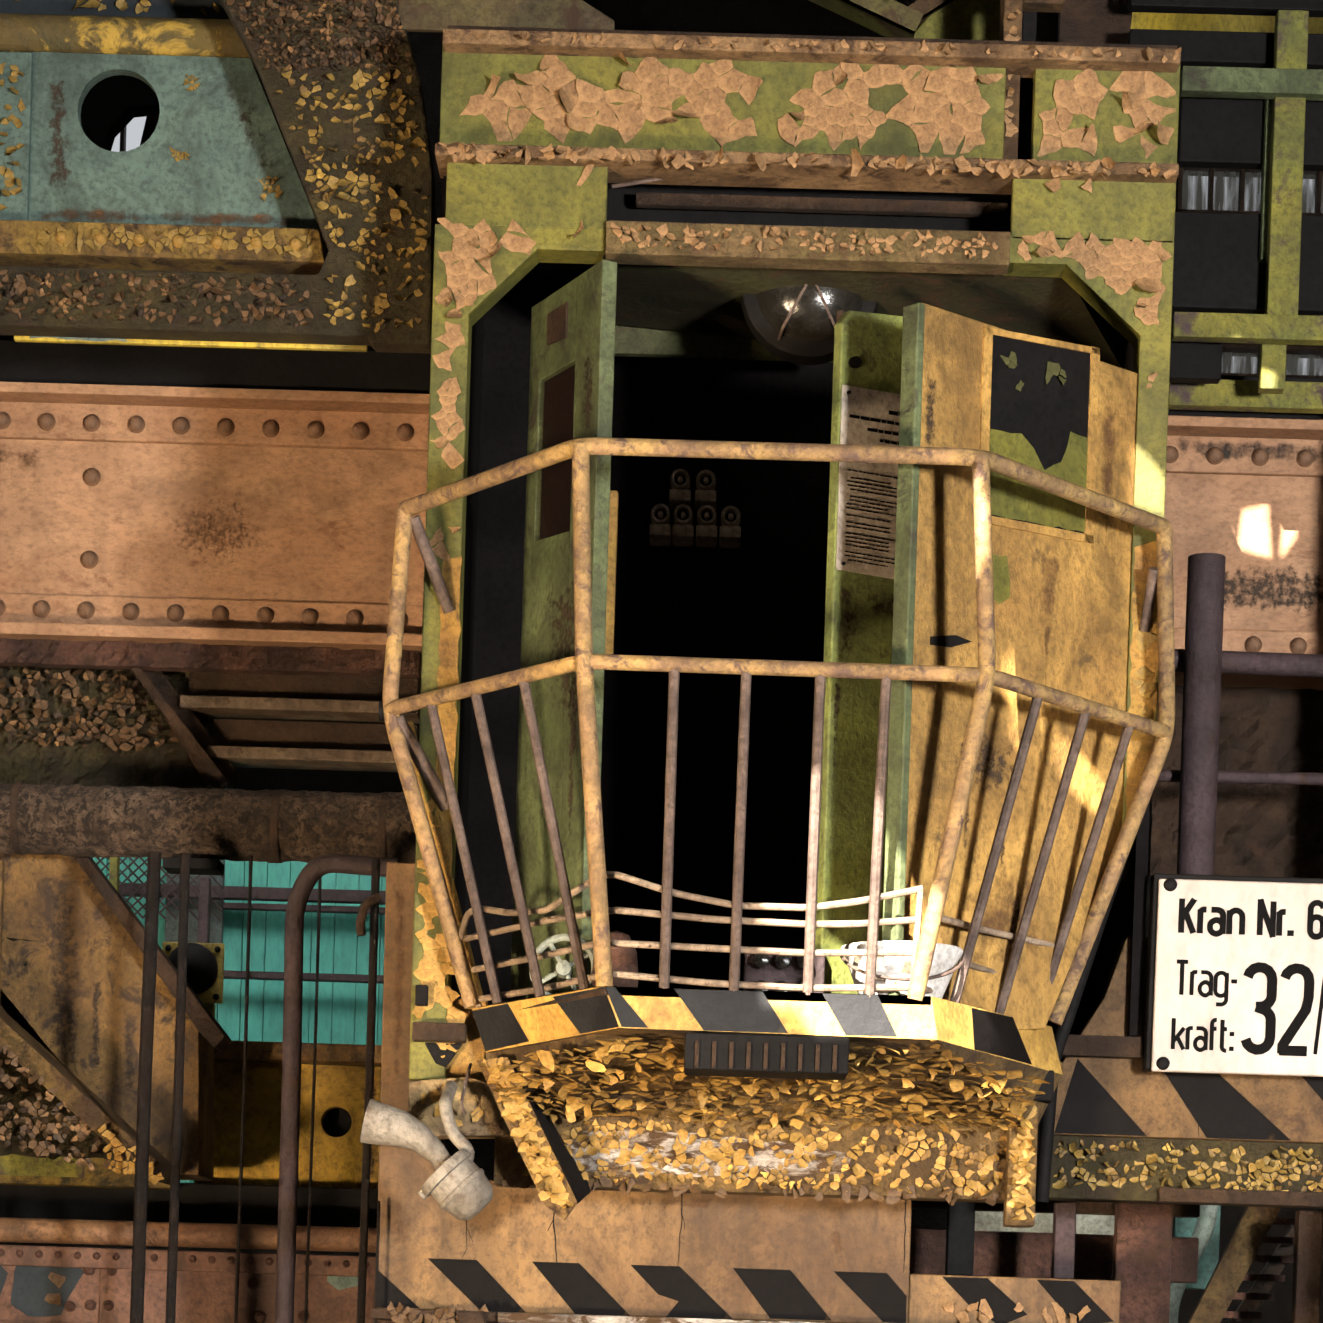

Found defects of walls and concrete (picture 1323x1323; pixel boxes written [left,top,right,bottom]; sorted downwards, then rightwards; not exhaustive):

peeling [755,9,1181,193]
peeling [0,0,763,469]
peeling [611,222,998,258]
peeling [1017,231,1172,326]
peeling [1000,351,1024,392]
peeling [1046,362,1067,385]
peeling [0,1265,84,1317]